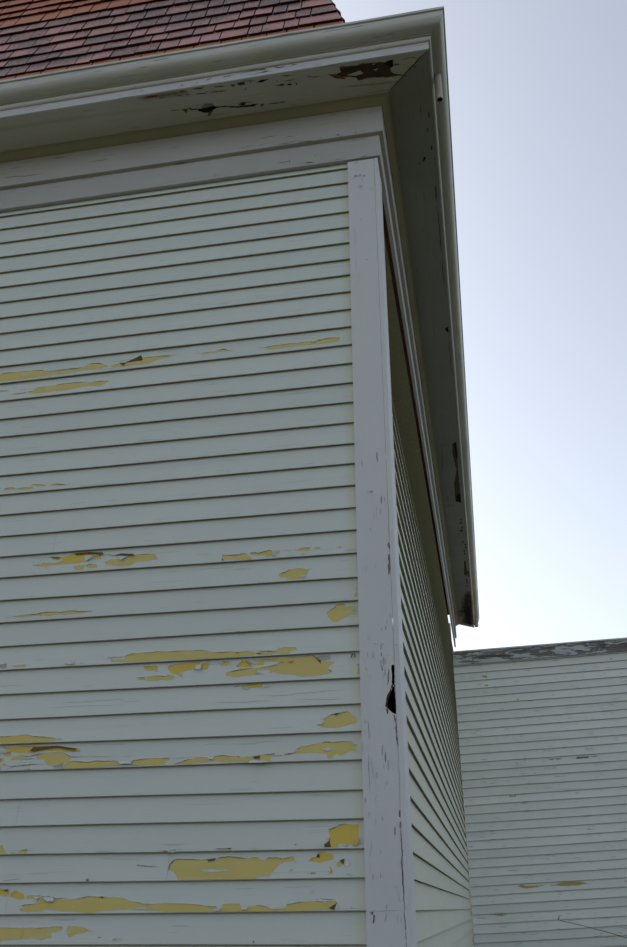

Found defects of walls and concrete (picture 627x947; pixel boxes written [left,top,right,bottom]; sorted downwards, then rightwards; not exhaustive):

peeling [0,354,173,395]
peeling [32,552,158,570]
peeling [222,547,321,561]
peeling [457,642,627,663]
peeling [109,647,335,689]
peeling [318,711,357,728]
peeling [0,734,357,770]
peeling [309,823,360,875]
peeling [164,847,296,880]
peeling [519,881,587,889]
peeling [0,889,339,913]
peeling [0,925,100,941]